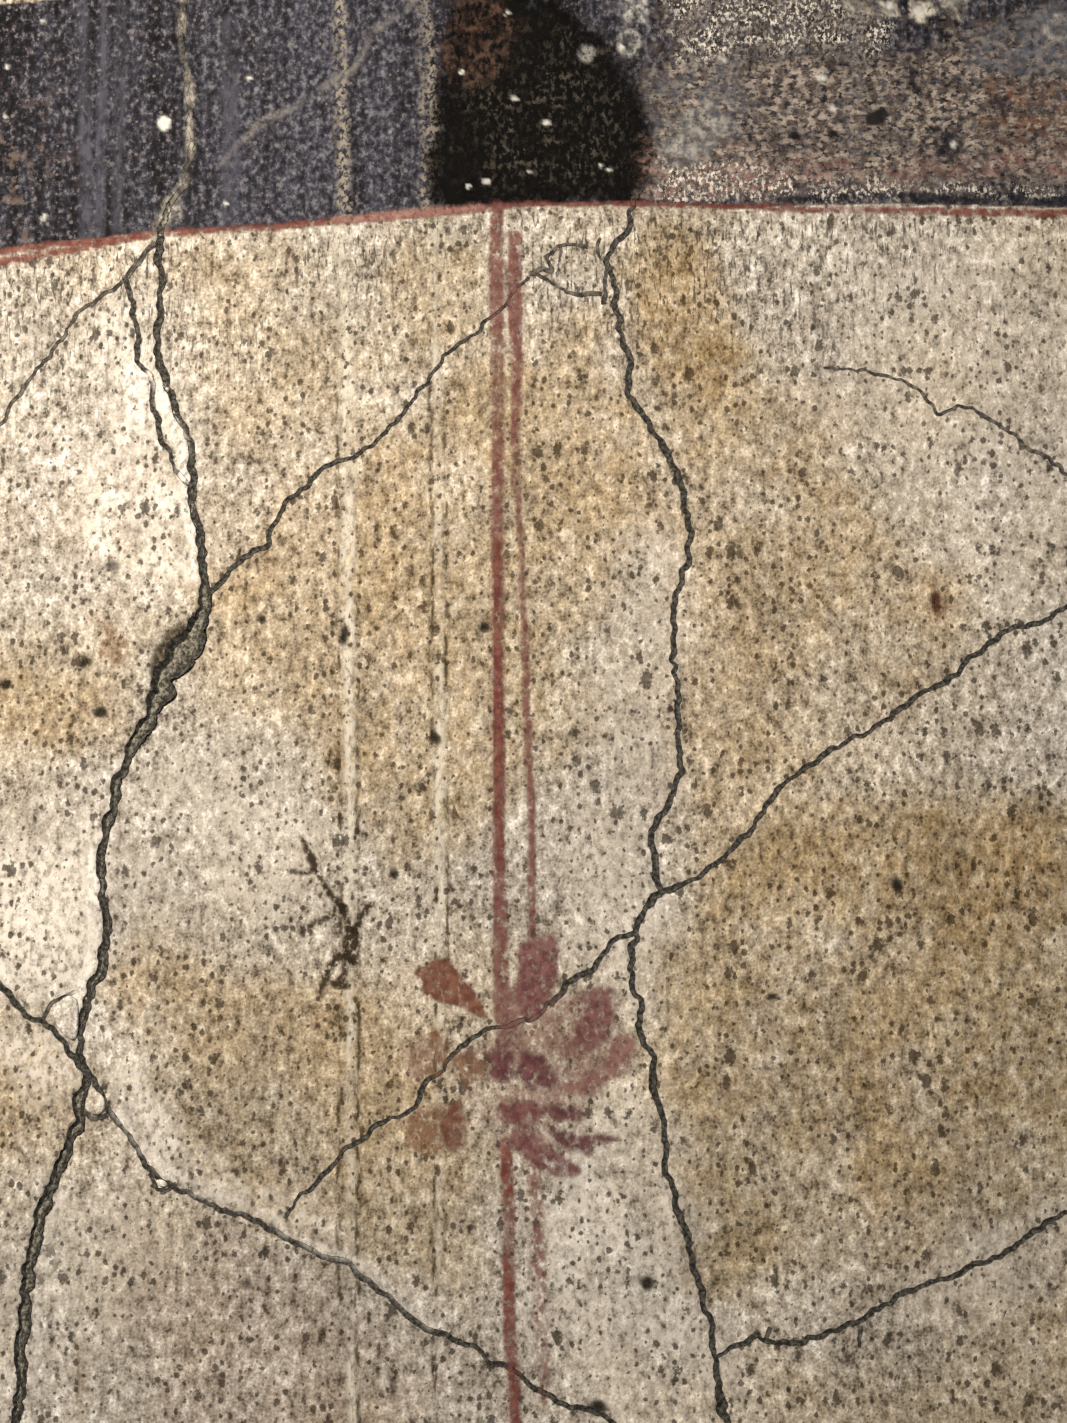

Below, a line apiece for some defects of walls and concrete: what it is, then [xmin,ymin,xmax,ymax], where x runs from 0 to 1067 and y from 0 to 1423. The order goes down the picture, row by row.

water stain [340,275,354,442]
crack [0,0,617,1423]
water stain [339,461,355,841]
crack [283,189,1067,1423]
water stain [125,1068,177,1150]
water stain [558,1168,634,1318]
water stain [347,1345,356,1423]